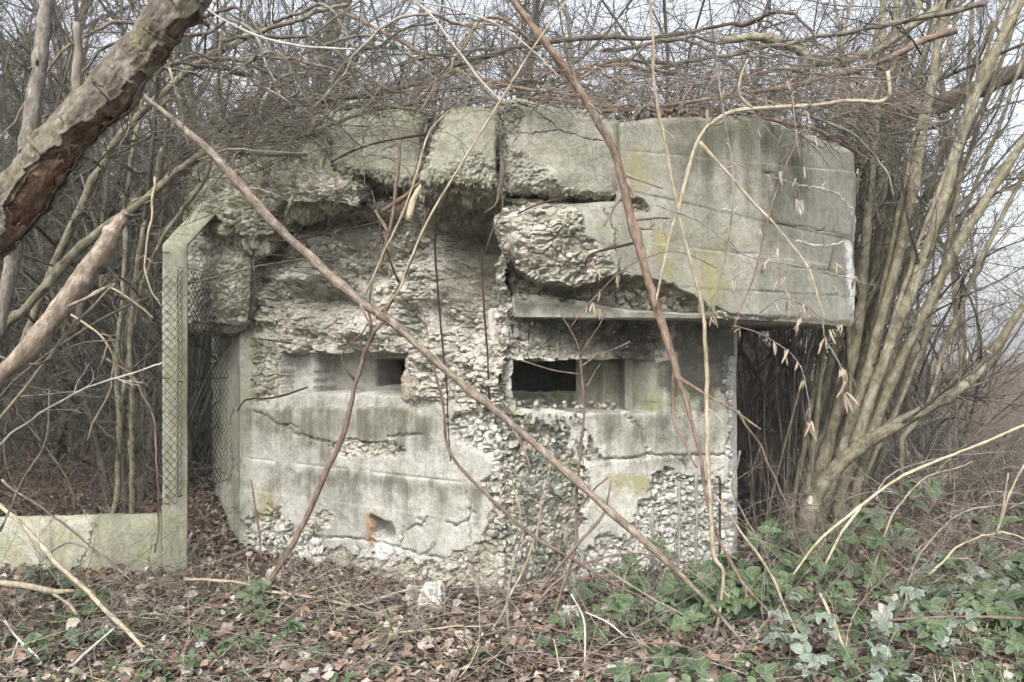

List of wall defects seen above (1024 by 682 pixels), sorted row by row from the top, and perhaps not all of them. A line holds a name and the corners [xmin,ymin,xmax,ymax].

crack [513,112,604,142]
spalling [240,197,778,592]
crack [228,411,337,485]
rust [367,513,378,545]